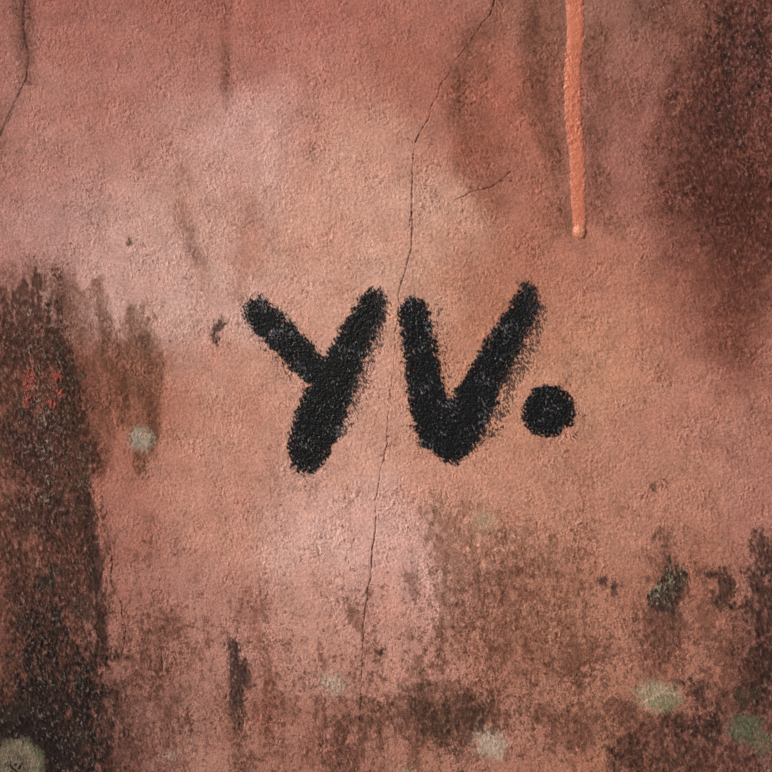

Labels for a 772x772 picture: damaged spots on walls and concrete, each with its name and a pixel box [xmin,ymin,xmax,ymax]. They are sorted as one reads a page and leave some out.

crack [398,0,496,308]
crack [453,171,517,223]
water stain [581,0,772,424]
crack [359,337,396,721]
water stain [0,245,772,772]